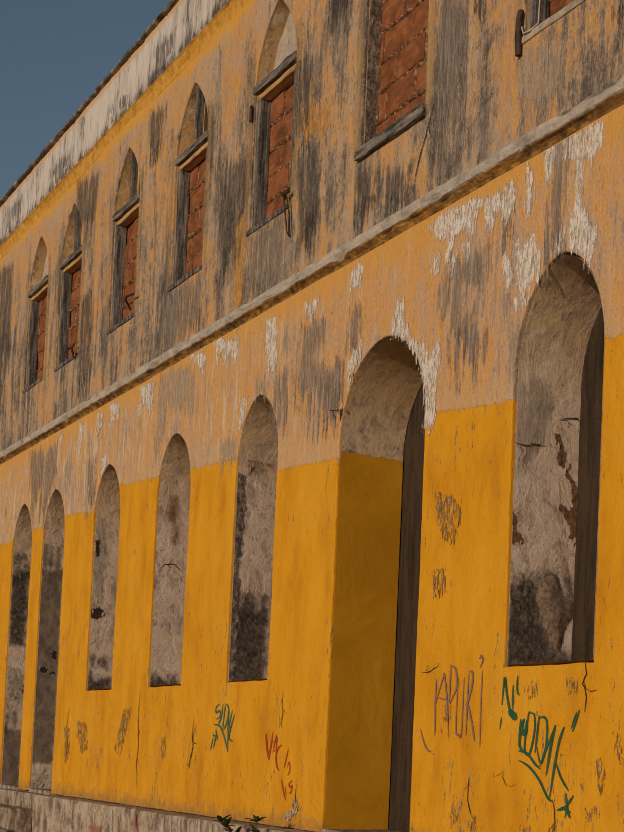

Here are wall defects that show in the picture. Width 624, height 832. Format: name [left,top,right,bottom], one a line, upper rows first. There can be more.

water stain [0,264,13,413]
water stain [214,150,286,320]
water stain [289,53,331,258]
water stain [266,299,366,442]
water stain [354,163,413,232]
peeling [390,297,442,435]
water stain [432,202,514,393]
peeling [429,120,605,312]
water stain [543,136,572,278]
peeling [436,491,461,548]
water stain [230,594,267,682]
water stain [507,572,571,667]